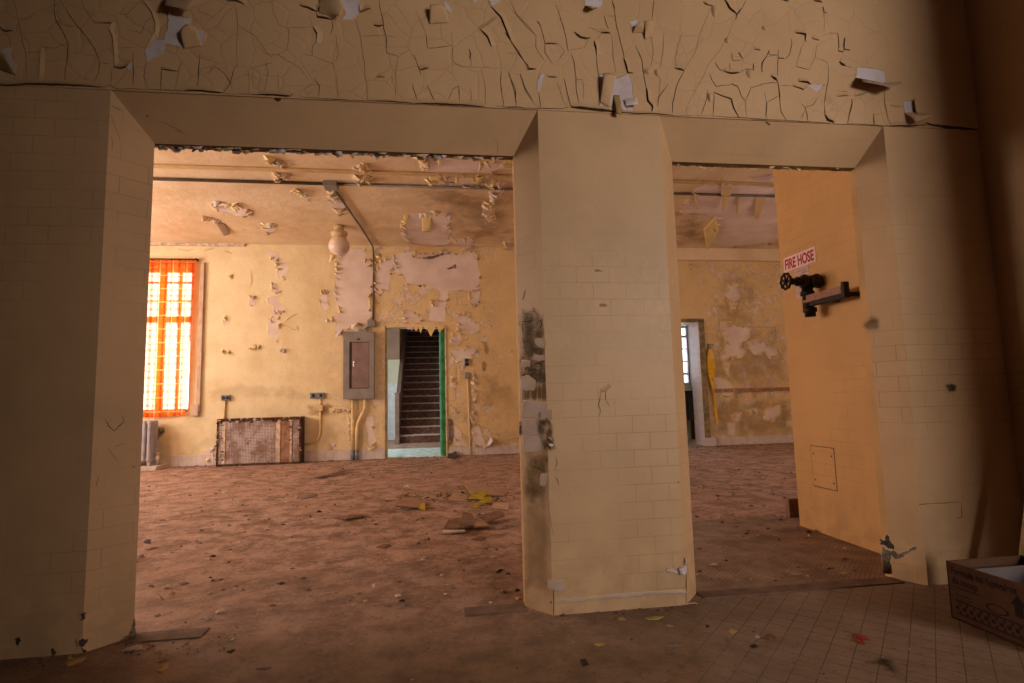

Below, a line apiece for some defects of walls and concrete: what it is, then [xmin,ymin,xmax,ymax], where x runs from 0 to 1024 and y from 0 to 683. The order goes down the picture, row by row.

crack [0,0,978,147]
peeling [201,200,279,236]
peeling [155,144,513,224]
peeling [672,162,854,250]
peeling [245,249,292,354]
peeling [317,210,493,451]
damp [521,313,546,382]
peeling [711,282,784,398]
peeling [511,337,554,454]
damp [527,419,554,497]
peeling [725,404,782,437]
spalling [880,535,917,574]